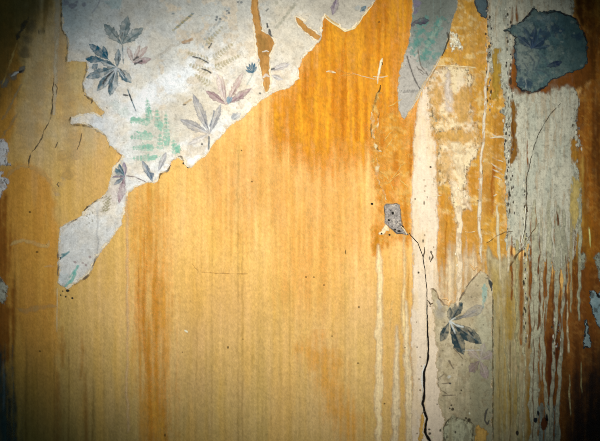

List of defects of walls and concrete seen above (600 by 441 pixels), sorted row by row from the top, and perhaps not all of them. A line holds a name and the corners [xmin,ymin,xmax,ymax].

leakage [272,0,412,166]
peeling [449,31,463,52]
crack [409,233,433,441]
peeling [379,64,488,441]
leakage [487,247,532,441]
peeling [483,0,591,441]